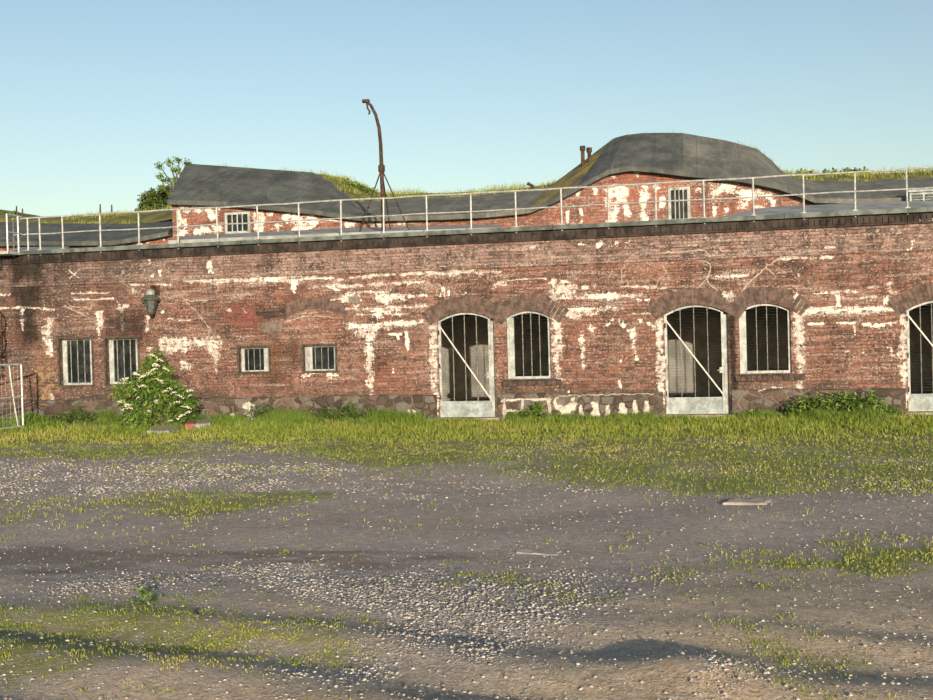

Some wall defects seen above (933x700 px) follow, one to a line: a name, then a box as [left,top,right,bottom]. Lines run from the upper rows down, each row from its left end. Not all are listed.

peeling [178,210,223,236]
peeling [370,297,402,321]